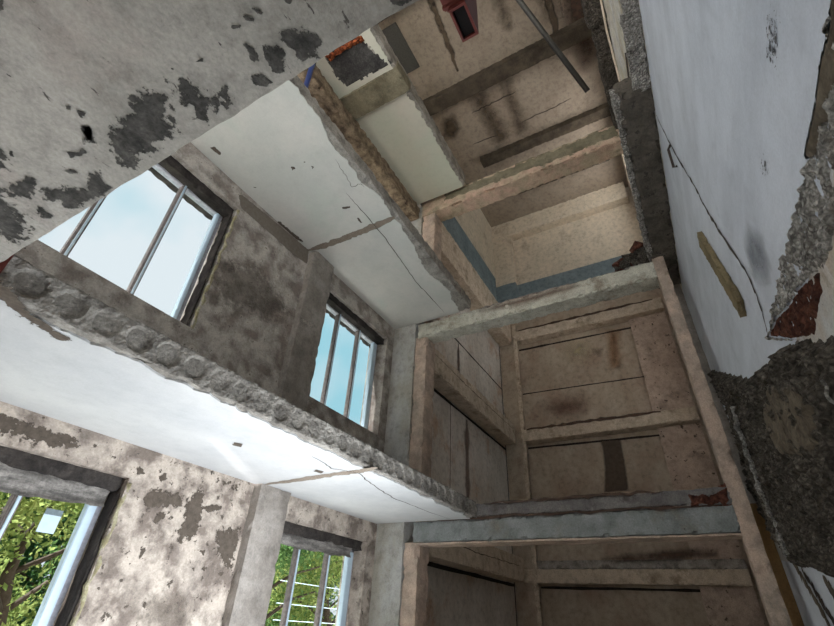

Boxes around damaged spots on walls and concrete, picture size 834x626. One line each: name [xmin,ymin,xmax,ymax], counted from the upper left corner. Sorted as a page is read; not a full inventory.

spalling [66,106,95,158]
spalling [107,78,233,170]
spalling [0,170,113,249]
crack [339,166,444,312]
spalling [707,273,834,578]
flaking render [143,473,222,544]
flaking render [688,483,731,507]
flaking render [200,525,241,576]